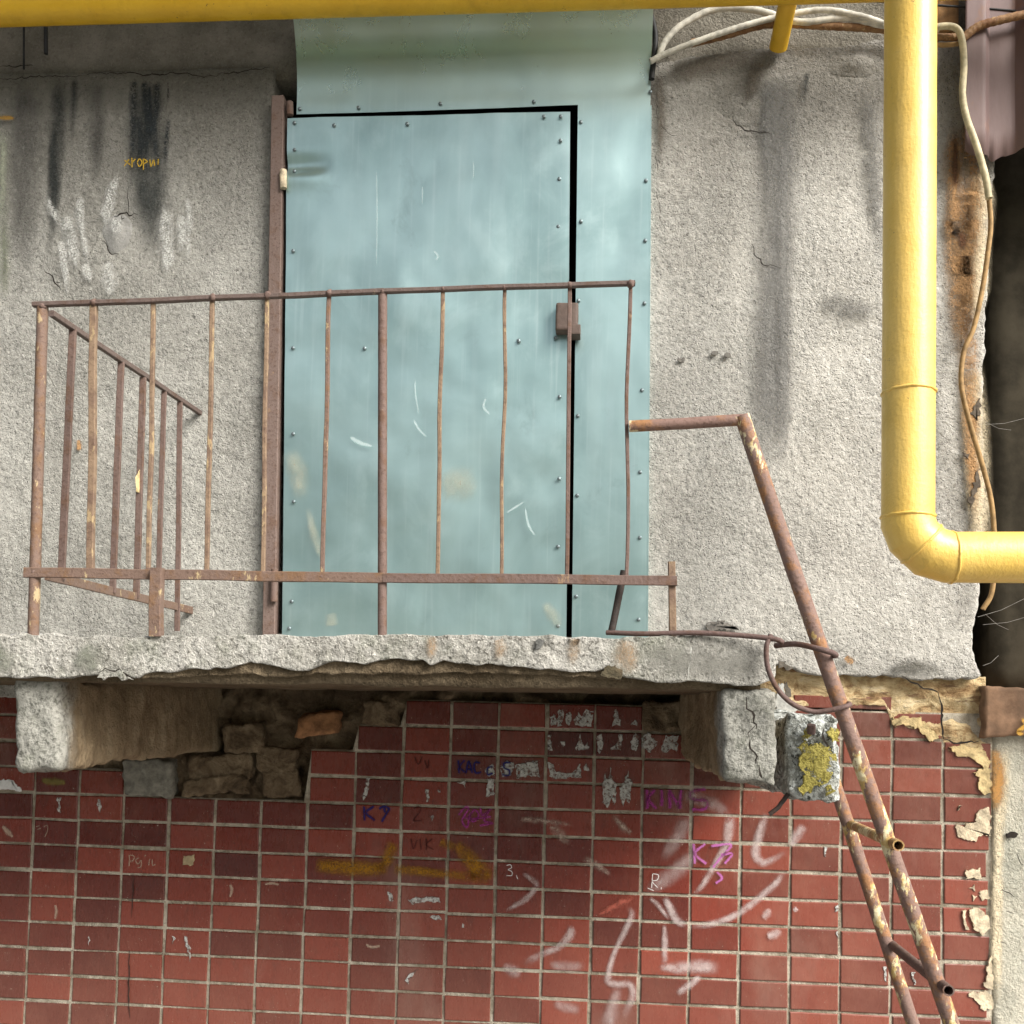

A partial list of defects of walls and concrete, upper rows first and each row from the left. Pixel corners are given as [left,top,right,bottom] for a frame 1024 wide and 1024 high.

crack [732,116,772,135]
damp [47,81,115,293]
damp [101,179,123,232]
crack [114,187,138,219]
damp [130,81,192,270]
rust [945,133,981,499]
flaking render [93,658,679,800]
crack [746,697,762,778]
crack [902,676,978,744]
peeling [950,745,992,842]
peeling [962,868,991,936]
peeling [968,954,994,1011]